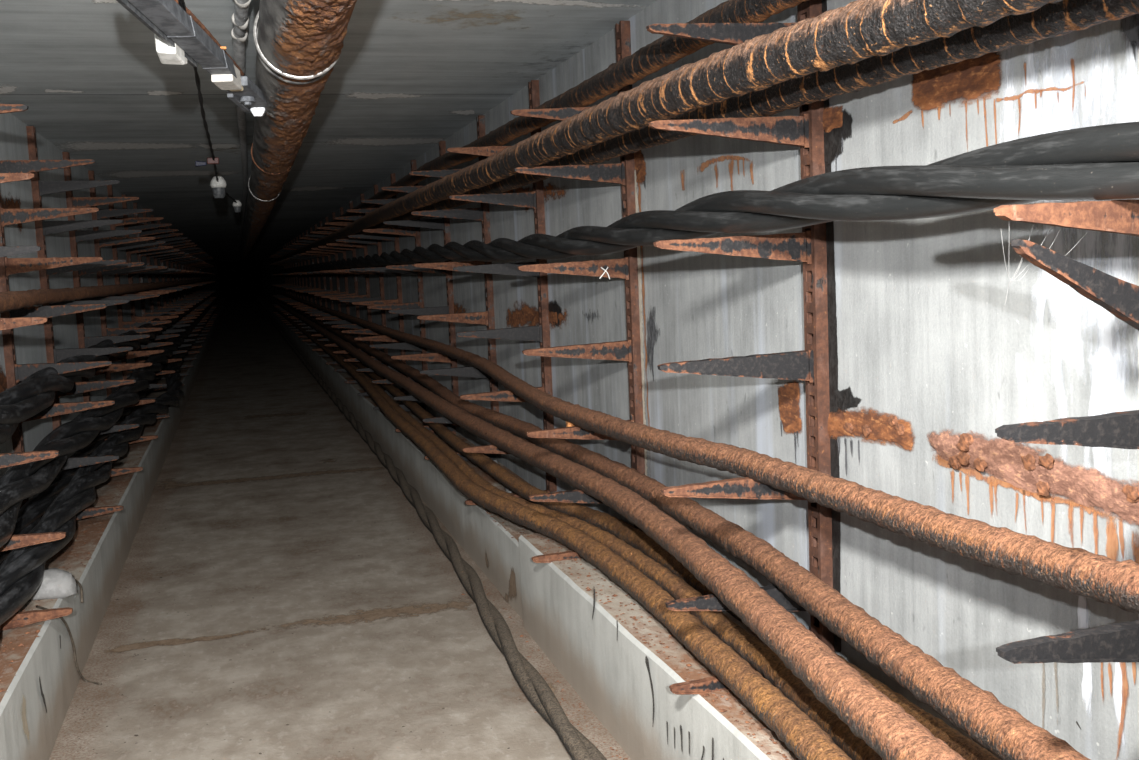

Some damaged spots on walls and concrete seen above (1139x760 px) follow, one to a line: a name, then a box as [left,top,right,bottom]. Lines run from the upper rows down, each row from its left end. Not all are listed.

rust [893,52,1001,148]
rust [699,155,754,191]
rust [506,301,567,328]
rust [778,381,802,462]
rust [828,408,914,475]